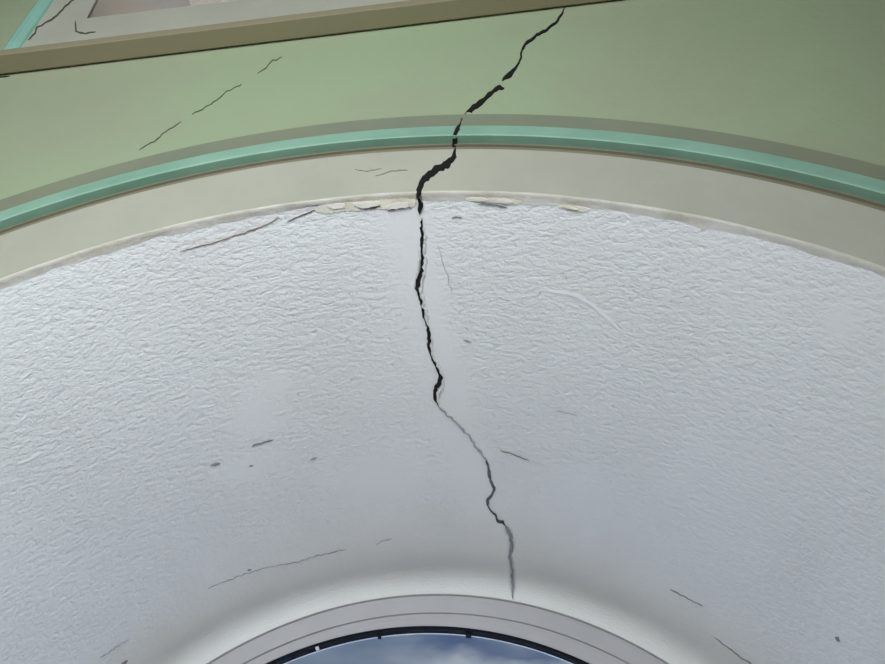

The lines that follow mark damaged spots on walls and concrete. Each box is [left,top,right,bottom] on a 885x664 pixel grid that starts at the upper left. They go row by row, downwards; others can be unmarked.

crack [28,0,96,40]
crack [140,56,282,150]
crack [180,210,315,252]
crack [355,8,565,600]